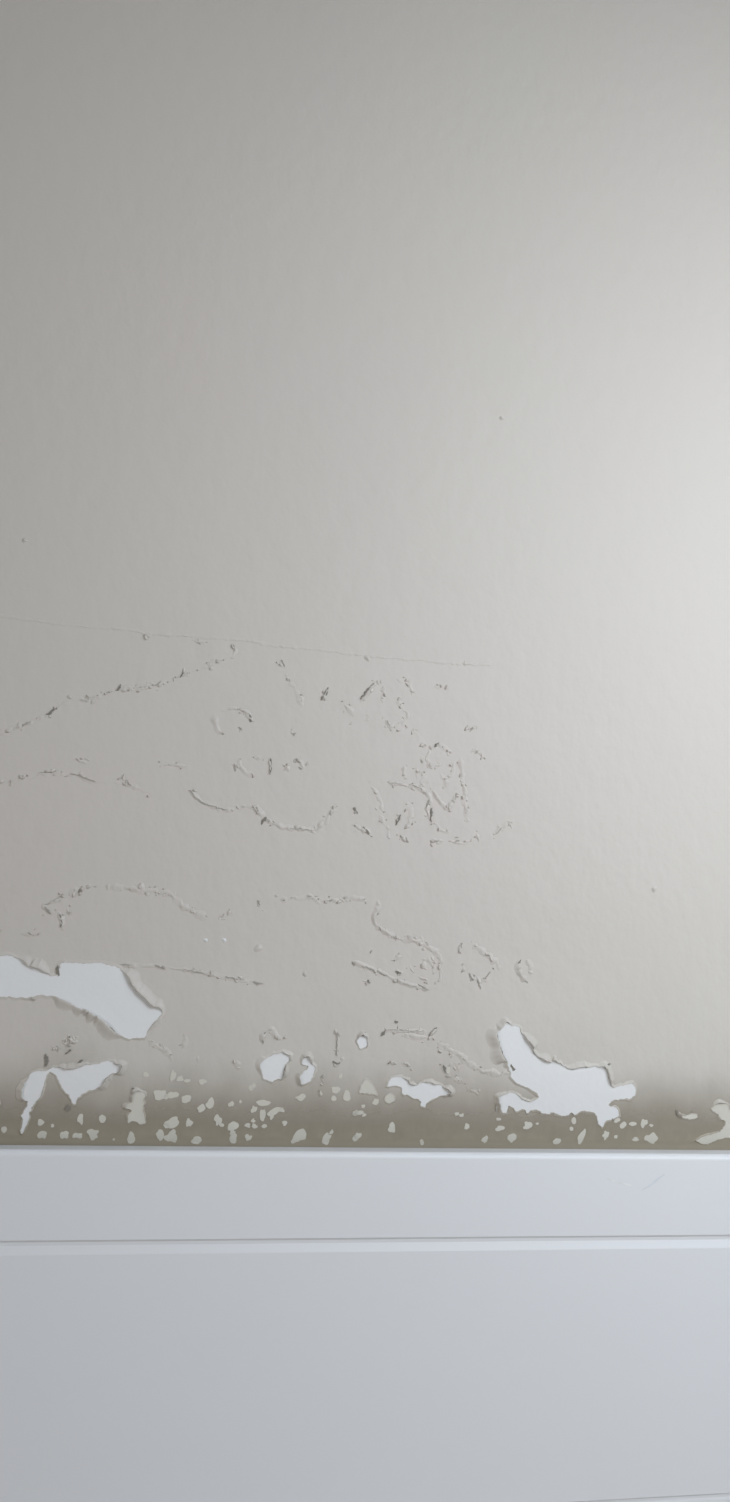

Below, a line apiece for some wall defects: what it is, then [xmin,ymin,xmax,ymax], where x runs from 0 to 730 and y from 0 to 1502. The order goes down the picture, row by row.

crack [0,644,238,735]
crack [0,674,513,847]
crack [0,882,509,1096]
peeling [0,951,658,1145]
peeling [676,1098,730,1146]